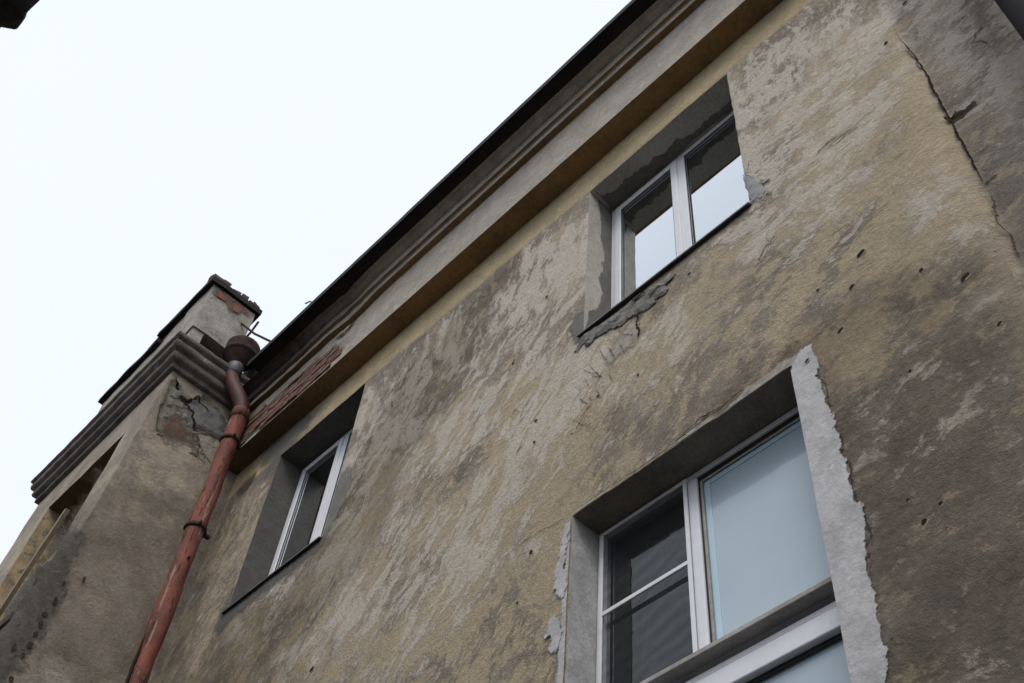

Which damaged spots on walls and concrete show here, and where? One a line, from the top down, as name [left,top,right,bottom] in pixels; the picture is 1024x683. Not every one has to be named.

crack [895,30,1020,257]
flaking render [574,272,691,364]
flaking render [155,376,226,463]
flaking render [235,338,347,453]
flaking render [506,354,810,683]